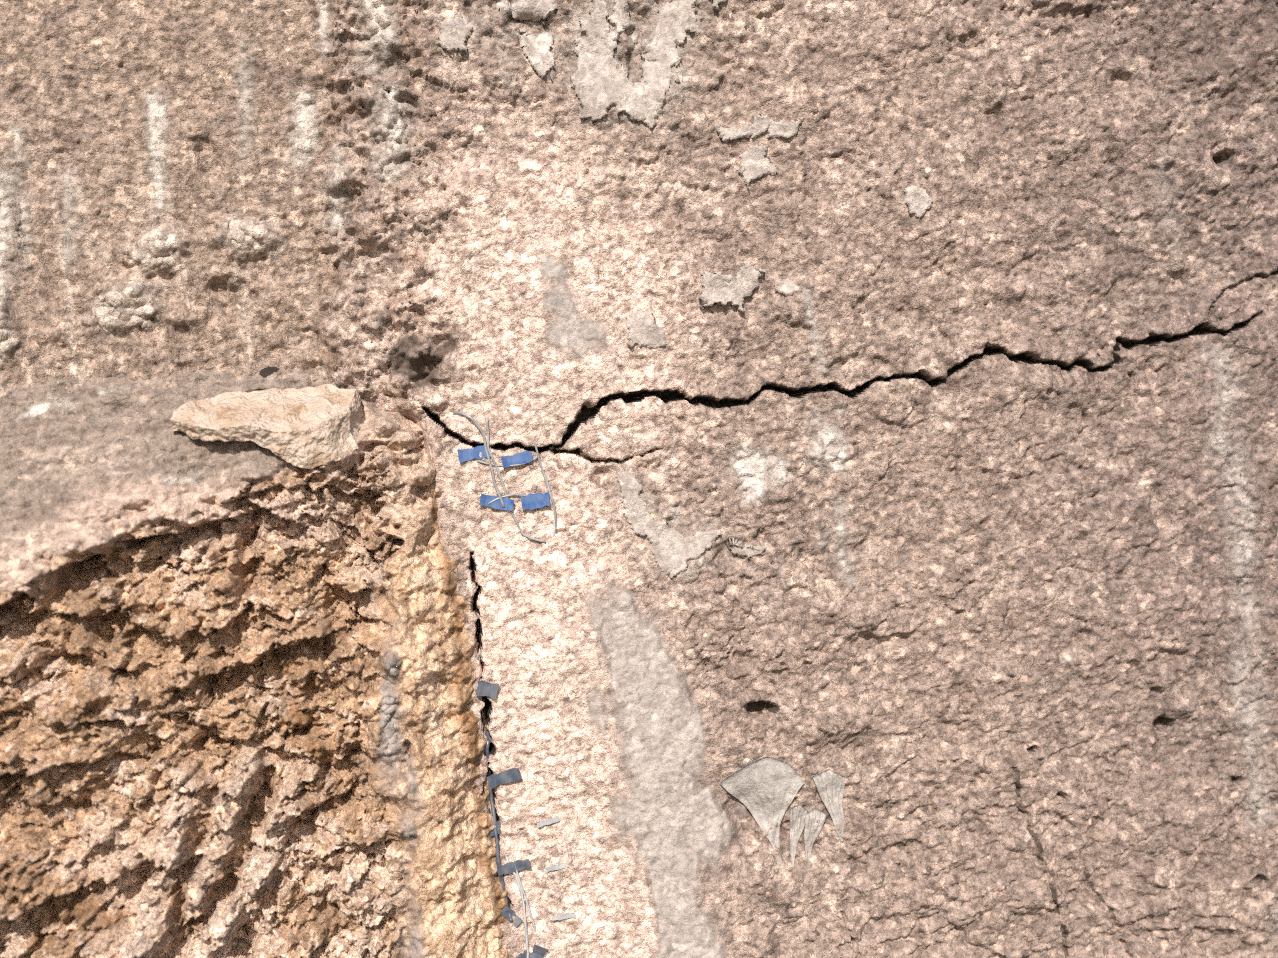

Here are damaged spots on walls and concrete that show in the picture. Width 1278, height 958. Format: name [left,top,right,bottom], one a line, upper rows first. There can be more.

crack [423,293,1254,463]